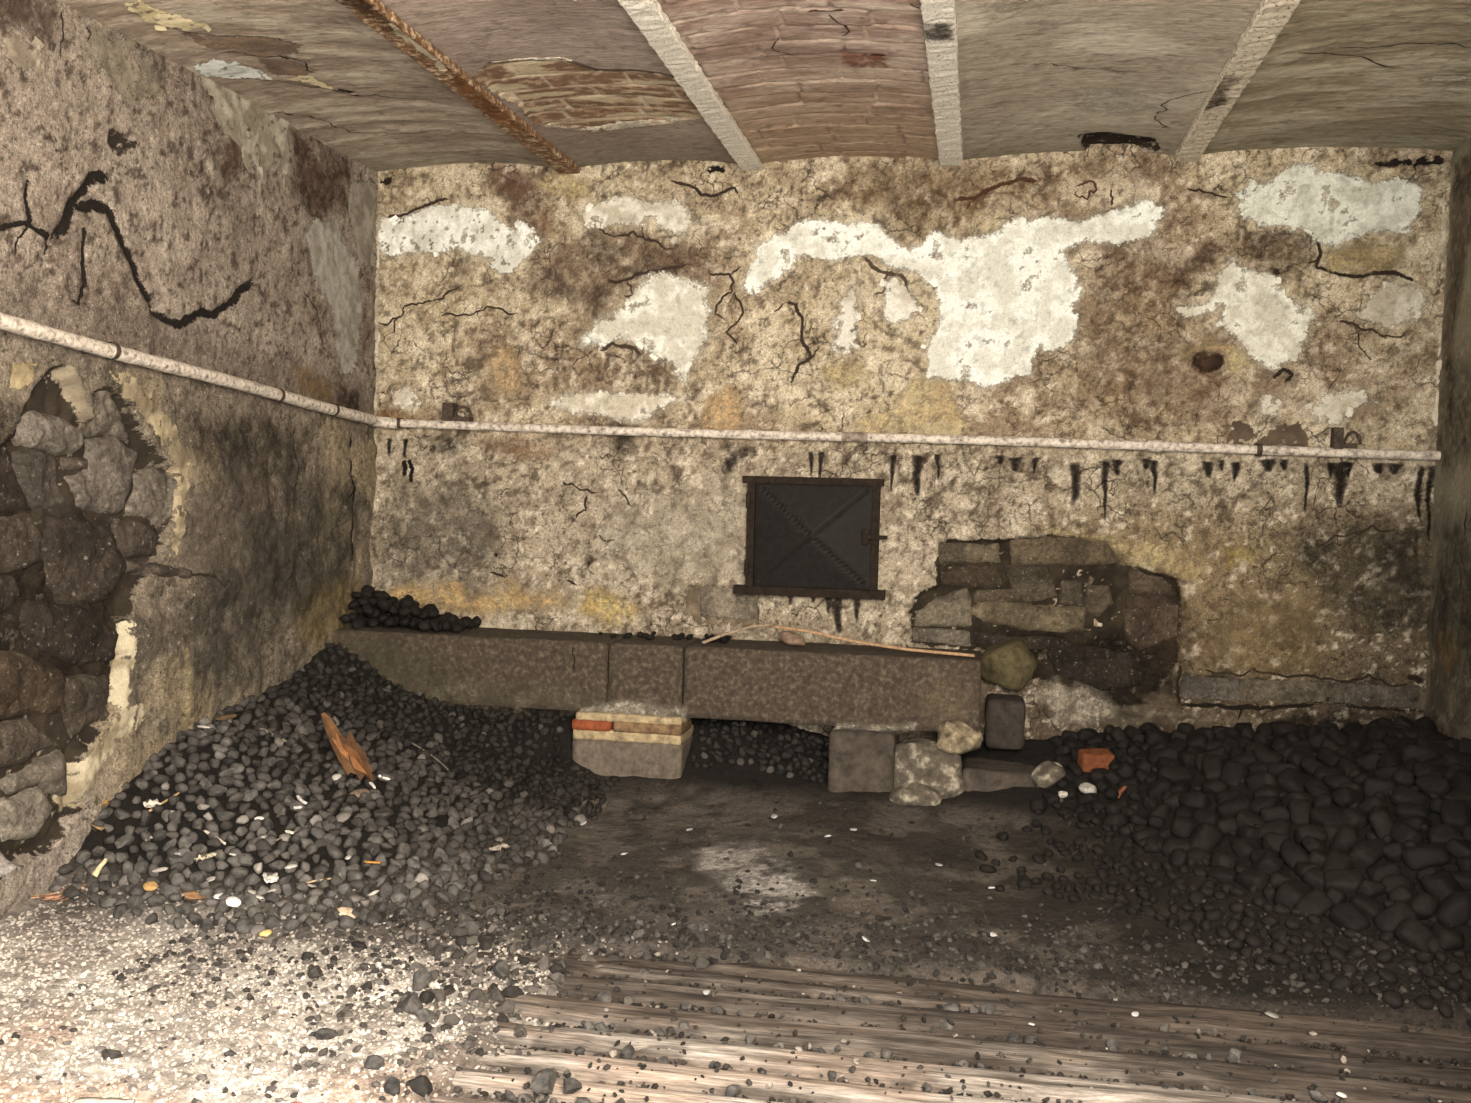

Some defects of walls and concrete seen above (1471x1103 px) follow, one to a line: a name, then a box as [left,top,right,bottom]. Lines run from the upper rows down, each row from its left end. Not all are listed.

crack [0,169,261,330]
peeling [551,270,712,423]
crack [597,226,820,386]
damp [808,451,824,477]
peeling [744,198,1165,389]
damp [1203,460,1240,482]
damp [1260,458,1309,511]
crack [1273,239,1413,282]
crack [1340,320,1405,360]
damp [1301,157,1471,672]
flaking render [0,361,193,880]
flaking render [909,533,1426,712]